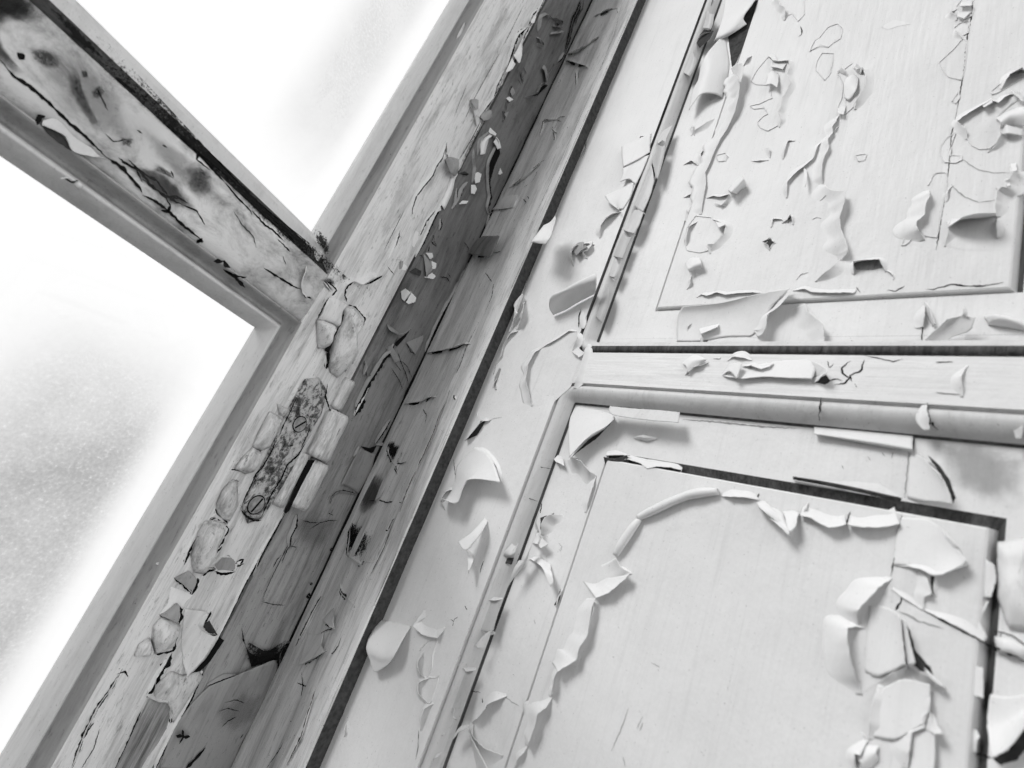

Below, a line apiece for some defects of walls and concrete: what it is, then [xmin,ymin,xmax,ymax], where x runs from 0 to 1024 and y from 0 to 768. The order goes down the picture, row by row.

water stain [0,44,15,67]
water stain [0,0,33,21]
water stain [34,51,57,66]
crack [0,48,300,289]
water stain [51,9,350,283]
peeling [318,8,563,369]
peeling [677,0,904,342]
peeling [892,0,1024,250]
peeling [683,351,830,384]
peeling [146,631,289,768]
peeling [439,412,969,768]
peeling [973,666,1024,765]